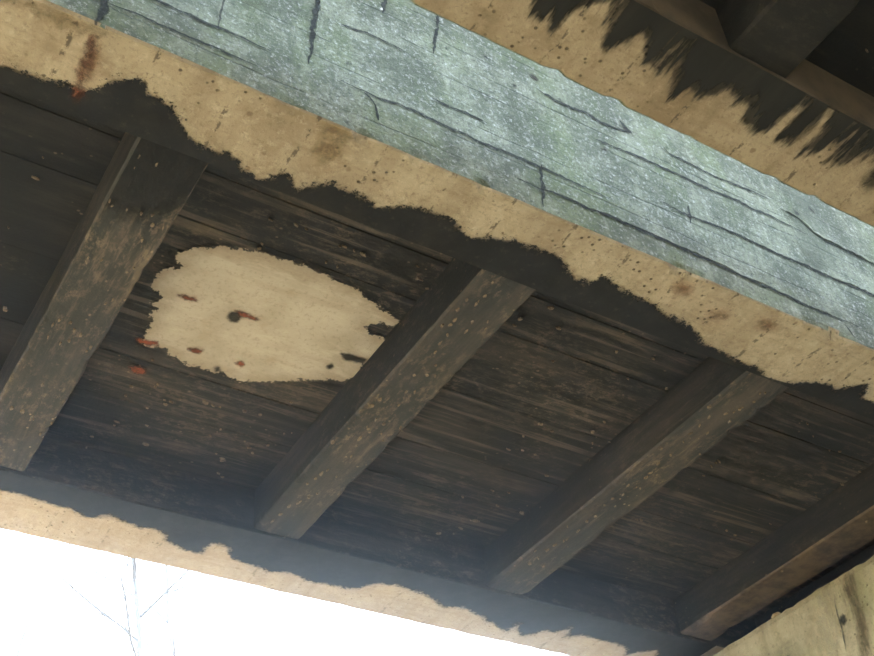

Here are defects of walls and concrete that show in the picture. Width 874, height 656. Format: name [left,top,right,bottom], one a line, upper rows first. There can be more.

rust [72,35,98,97]
crack [94,0,271,67]
crack [308,0,405,64]
crack [432,15,440,53]
crack [341,80,874,336]
water stain [864,171,874,188]
peeling [136,242,400,384]